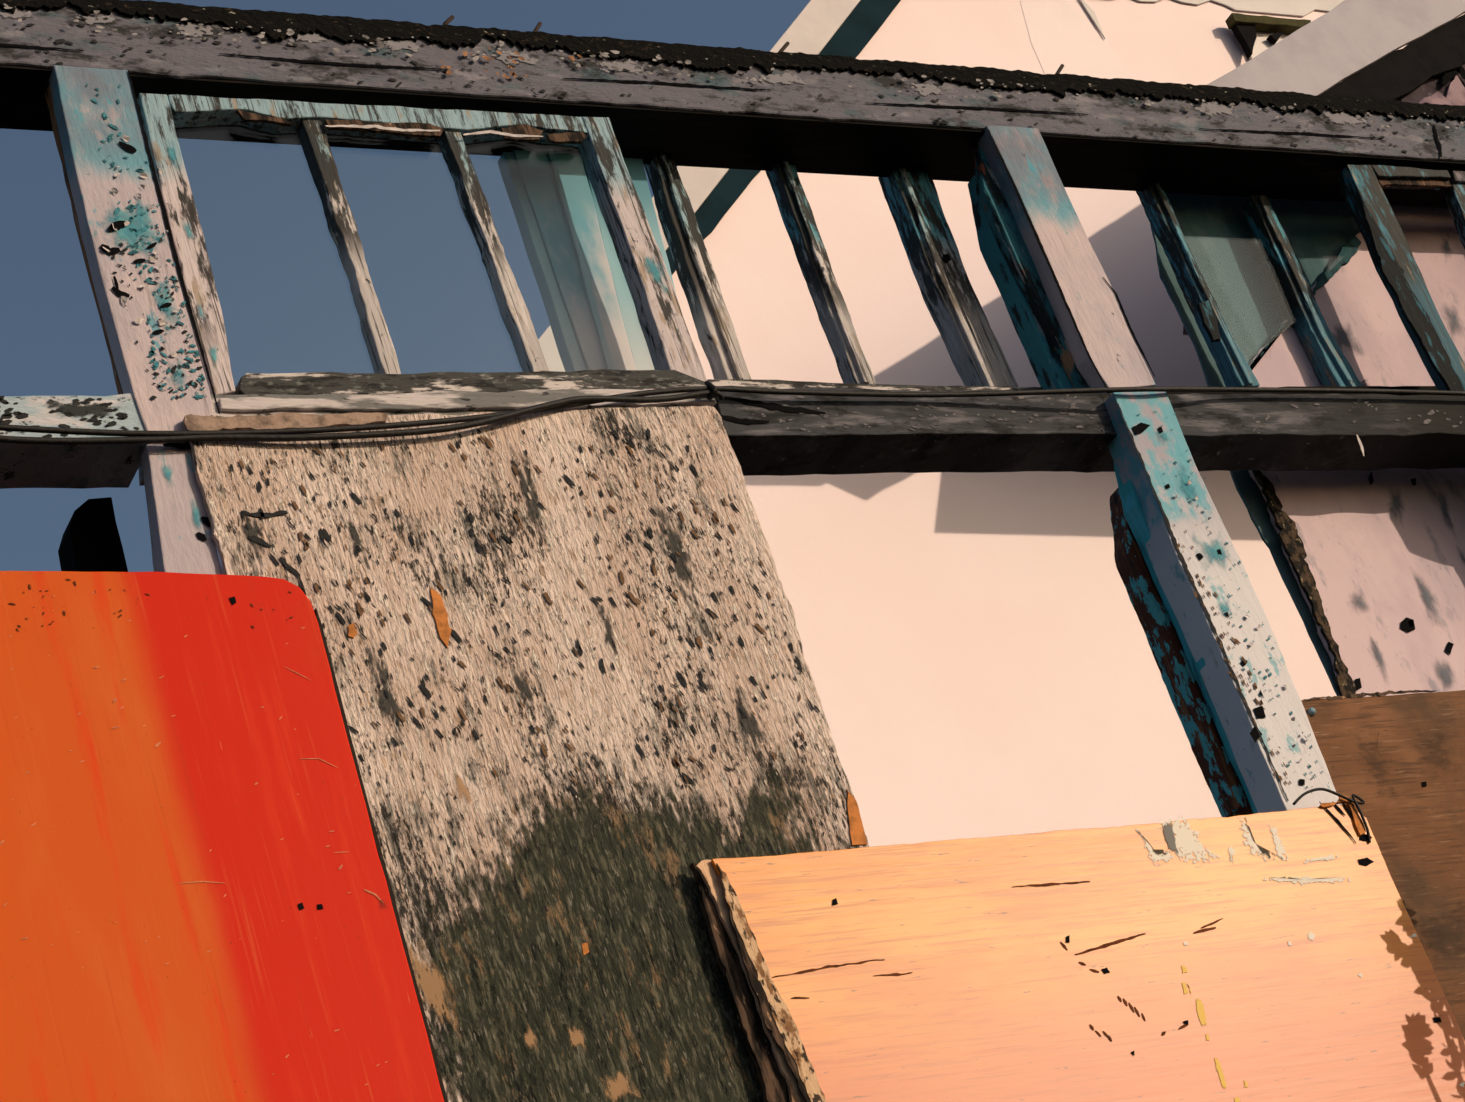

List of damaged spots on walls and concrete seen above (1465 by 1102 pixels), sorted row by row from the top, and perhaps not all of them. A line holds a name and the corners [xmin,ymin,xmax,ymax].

peeling [86,84,149,172]
peeling [0,396,139,437]
spalling [1164,450,1437,788]
damp [514,673,534,706]
damp [409,687,833,1102]
peeling [1136,816,1351,885]